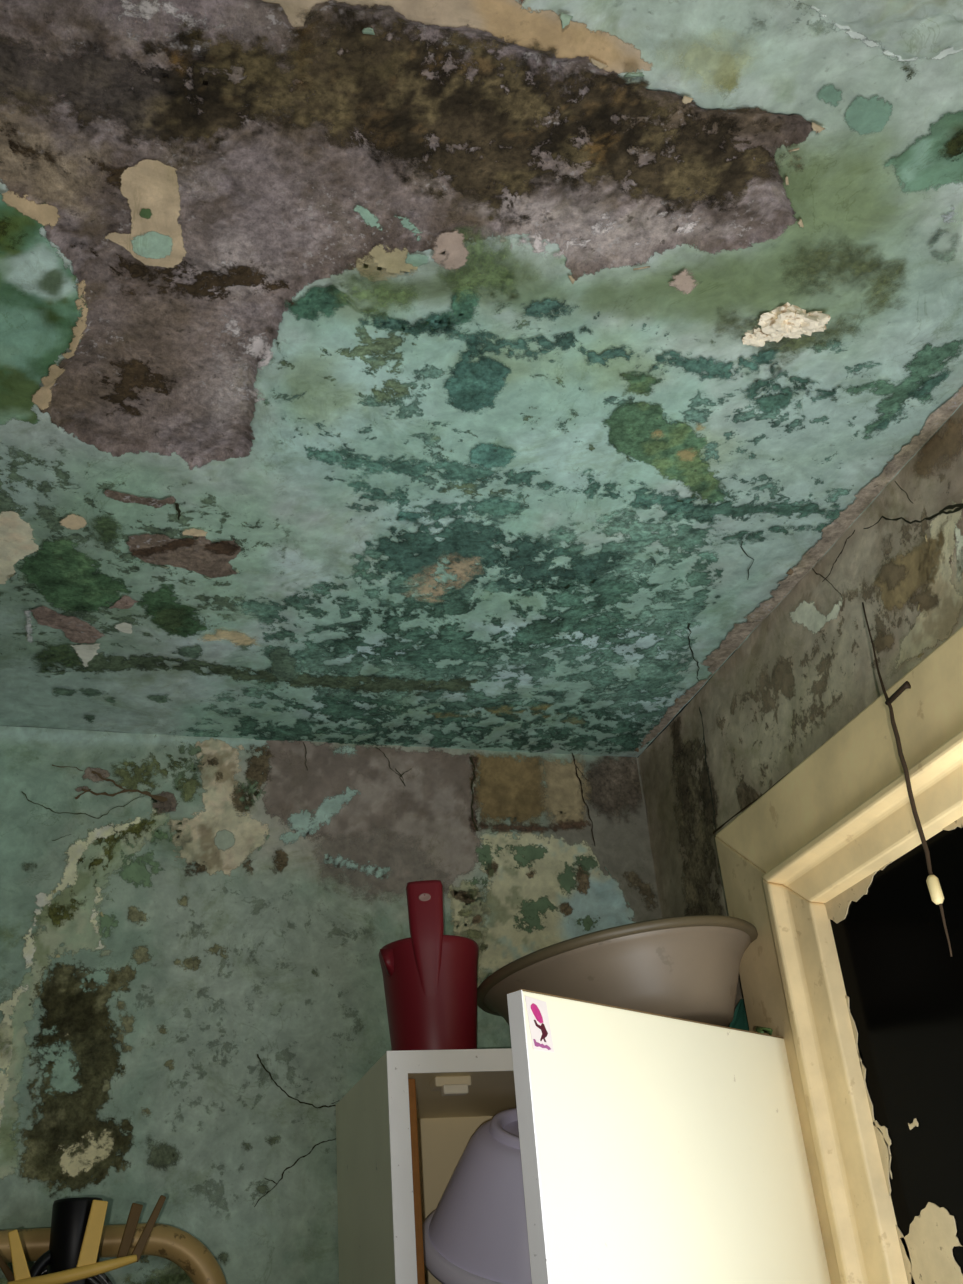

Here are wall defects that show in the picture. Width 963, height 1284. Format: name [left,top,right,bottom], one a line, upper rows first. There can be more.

spalling [0,0,831,470]
peeling [60,514,87,530]
peeling [126,528,242,580]
damp [0,229,963,916]
crack [812,481,963,599]
damp [128,906,148,926]
damp [174,944,229,971]
peeling [0,738,635,1179]
damp [18,946,179,1199]